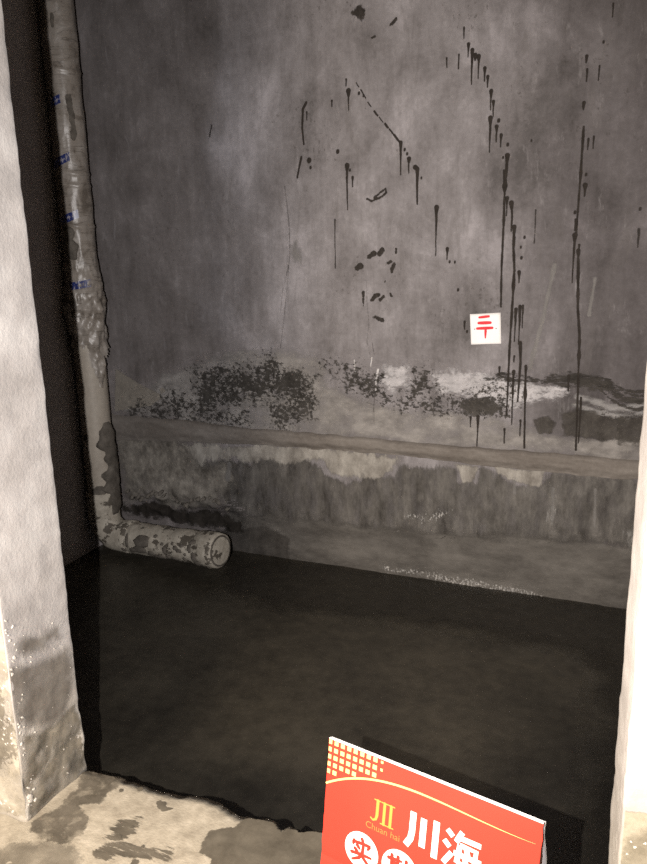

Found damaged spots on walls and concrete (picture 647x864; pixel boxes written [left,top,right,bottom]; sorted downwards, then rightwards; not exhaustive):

leakage [351,5,365,21]
leakage [126,27,644,460]
leakage [196,457,637,710]
leakage [0,625,123,864]
leakage [93,816,174,864]
leakage [199,818,322,864]
leakage [621,811,647,864]